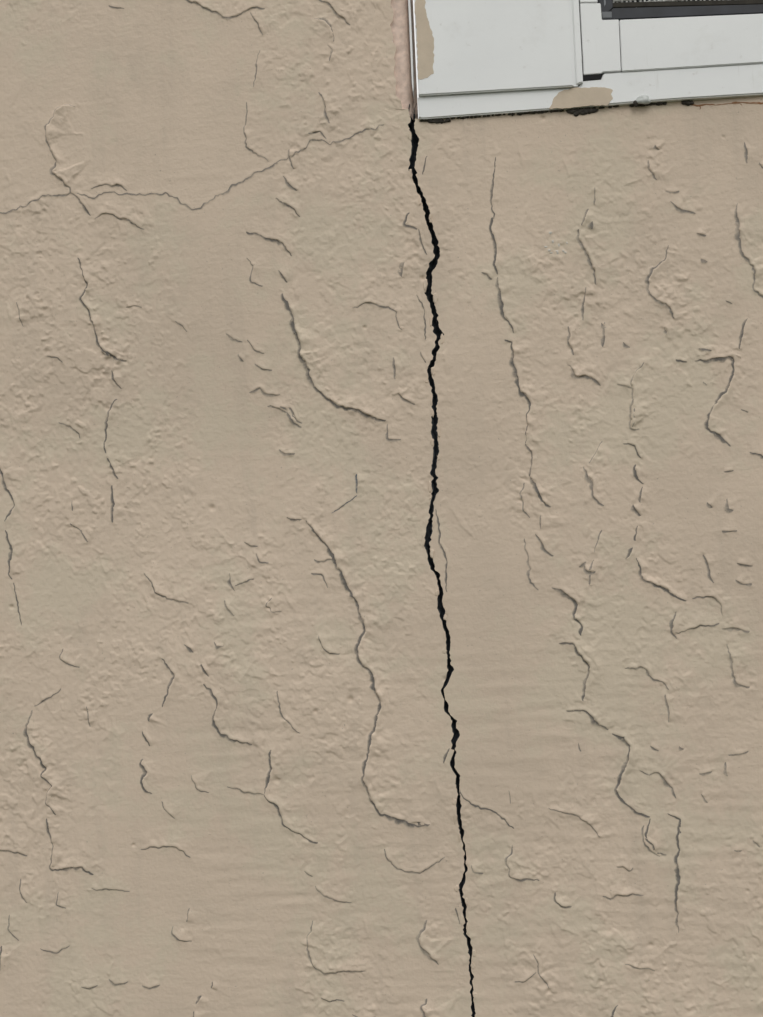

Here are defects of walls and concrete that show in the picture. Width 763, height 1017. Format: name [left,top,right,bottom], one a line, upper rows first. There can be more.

crack [0,121,384,217]
crack [77,255,127,523]
crack [246,229,386,422]
crack [482,157,552,508]
crack [676,318,763,459]
crack [0,463,25,625]
crack [402,103,516,1017]
crack [623,440,687,601]
crack [22,687,95,875]
crack [139,656,318,844]
crack [287,514,430,829]
crack [552,585,685,933]